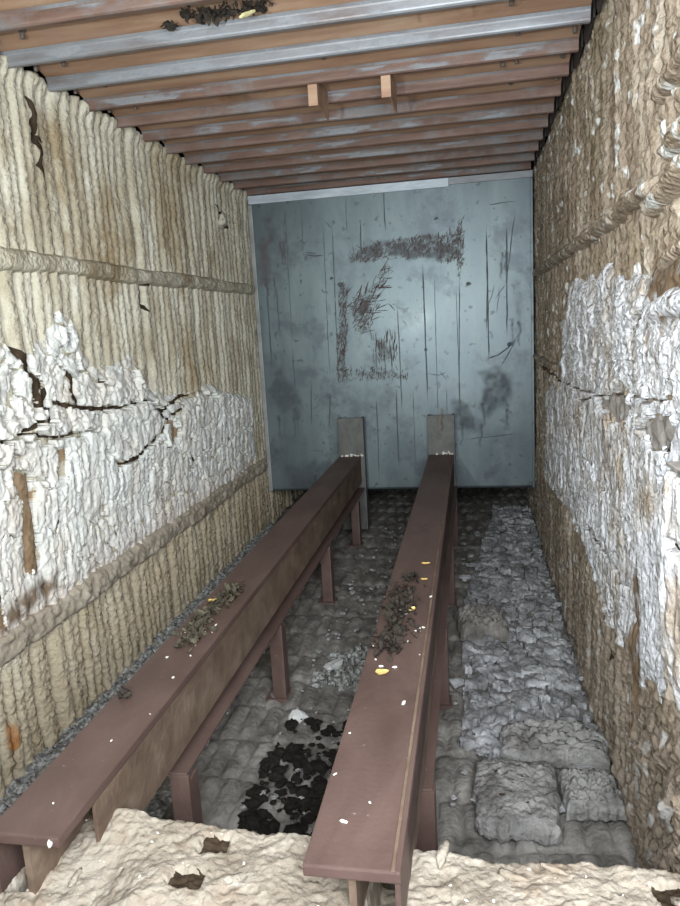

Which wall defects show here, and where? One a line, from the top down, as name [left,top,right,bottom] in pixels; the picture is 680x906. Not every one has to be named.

water stain [646,257,680,337]
crack [0,346,195,465]
crack [540,366,672,402]
water stain [0,581,54,636]
water stain [628,575,640,725]